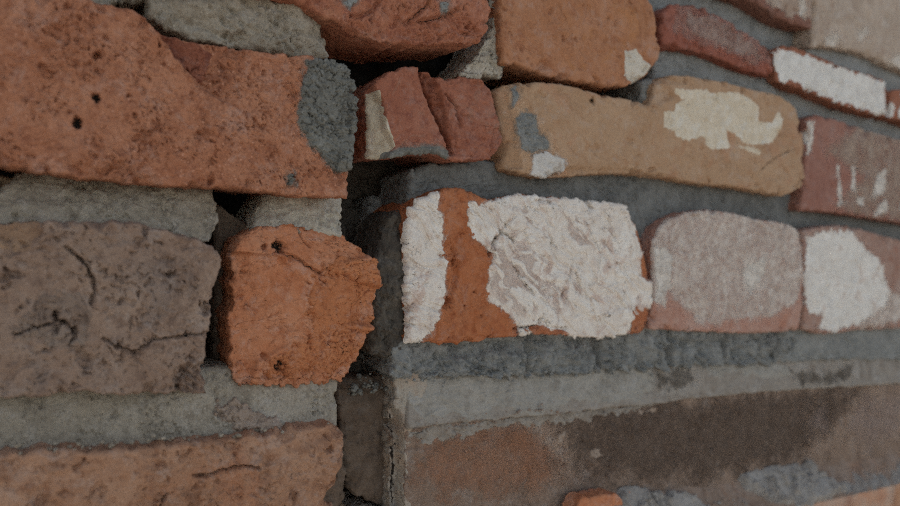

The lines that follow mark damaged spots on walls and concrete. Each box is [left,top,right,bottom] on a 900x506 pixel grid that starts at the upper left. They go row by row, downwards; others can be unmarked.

peeling [771,48,900,118]
crack [66,247,98,310]
peeling [400,188,653,344]
peeling [802,228,890,333]
crack [103,334,192,351]